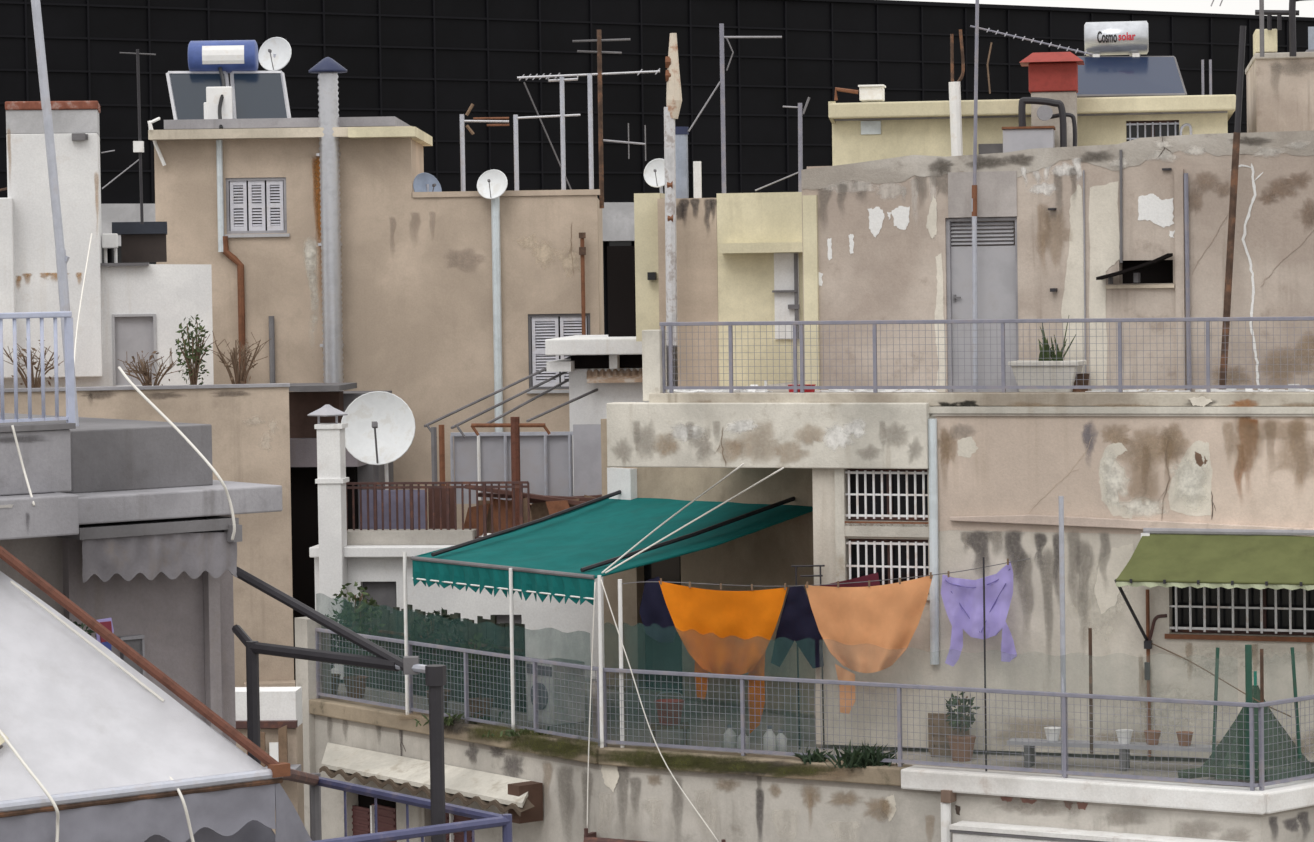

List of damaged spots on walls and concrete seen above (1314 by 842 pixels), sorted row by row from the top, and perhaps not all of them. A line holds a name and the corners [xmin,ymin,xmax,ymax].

peeling [868,206,910,238]
peeling [926,196,937,239]
peeling [1138,194,1175,238]
peeling [819,238,832,286]
peeling [1061,181,1120,391]
peeling [934,253,946,392]
damp [823,421,865,450]
flaking render [1099,443,1134,519]
flaking render [1167,440,1213,516]
damp [970,532,987,564]
damp [1006,532,1059,578]